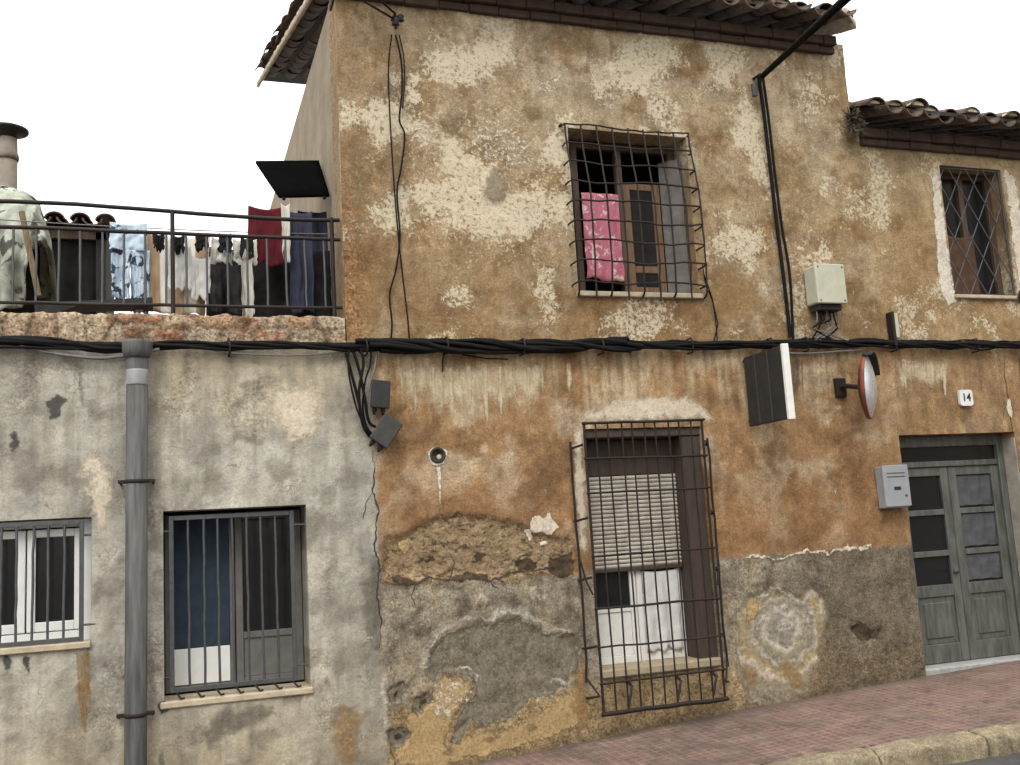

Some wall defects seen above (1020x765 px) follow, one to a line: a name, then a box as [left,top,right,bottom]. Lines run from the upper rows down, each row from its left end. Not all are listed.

peeling [407,119,442,154]
peeling [472,113,533,193]
spalling [428,447,448,501]
crack [363,451,575,648]
spalling [379,511,576,587]
damp [736,586,826,707]
spalling [392,675,587,765]